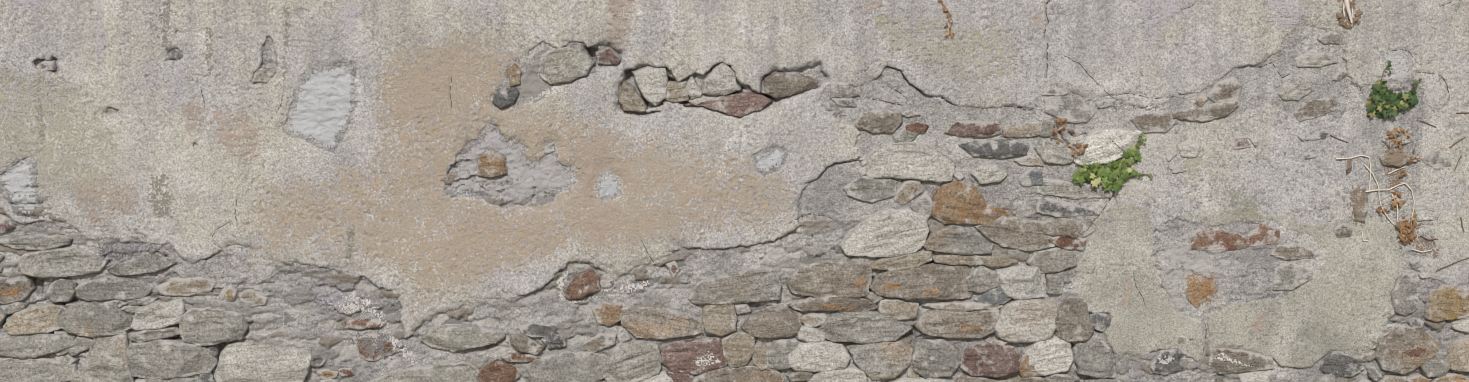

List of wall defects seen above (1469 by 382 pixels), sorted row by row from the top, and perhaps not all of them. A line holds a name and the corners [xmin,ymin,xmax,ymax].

crack [1004,0,1173,111]
spalling [289,66,353,147]
spalling [1,161,38,214]
spalling [451,130,570,201]
spalling [598,175,617,198]
spalling [757,150,784,171]
spalling [1164,232,1230,311]